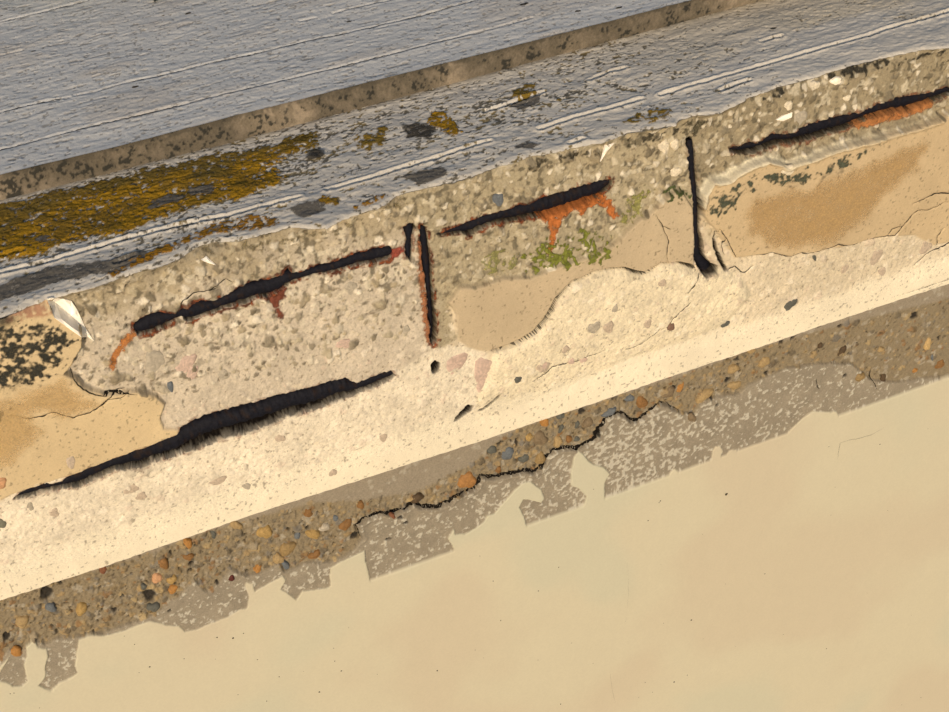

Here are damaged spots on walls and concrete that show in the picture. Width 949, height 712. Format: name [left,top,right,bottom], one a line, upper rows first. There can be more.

corrosion [851,99,933,129]
corrosion [535,193,619,250]
crack [712,192,949,273]
crack [176,278,232,313]
corrosion [418,241,430,343]
spalling [0,48,949,585]
water stain [0,316,89,459]
crack [355,401,678,535]